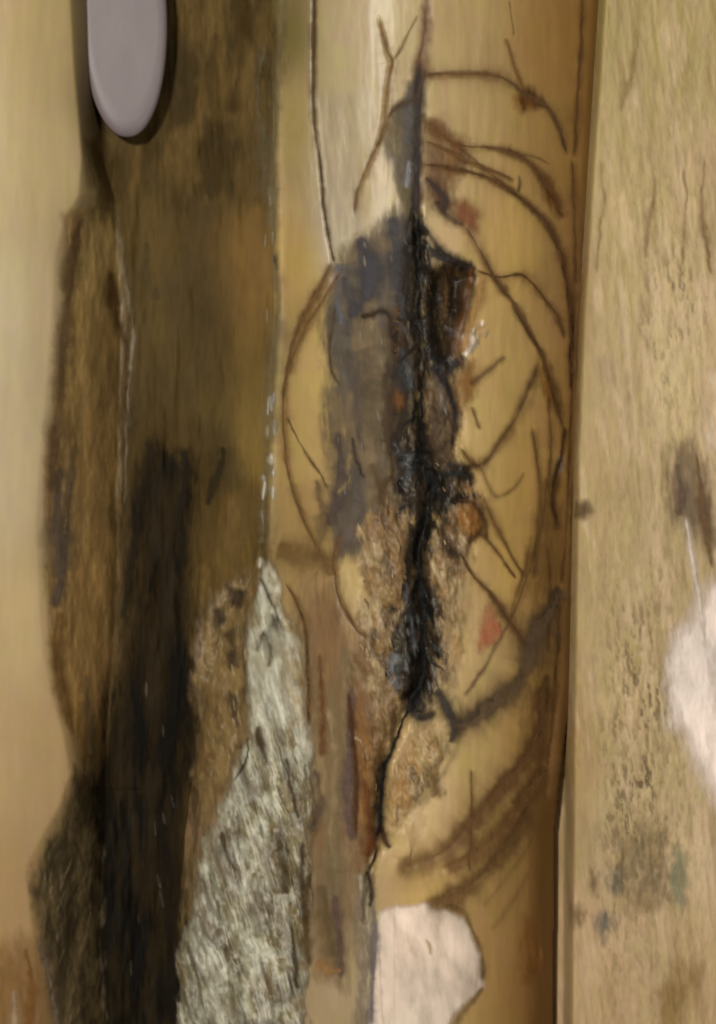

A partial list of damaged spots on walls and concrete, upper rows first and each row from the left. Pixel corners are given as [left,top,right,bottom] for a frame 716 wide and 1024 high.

damp [92,0,278,207]
corrosion [426,138,477,230]
damp [30,433,266,1024]
spalling [176,510,318,1024]
damp [314,19,480,709]
spalling [349,498,451,829]
spalling [428,401,487,686]
crack [354,0,600,908]
peeling [666,520,716,796]
damp [672,445,712,564]
peeling [354,874,484,1024]